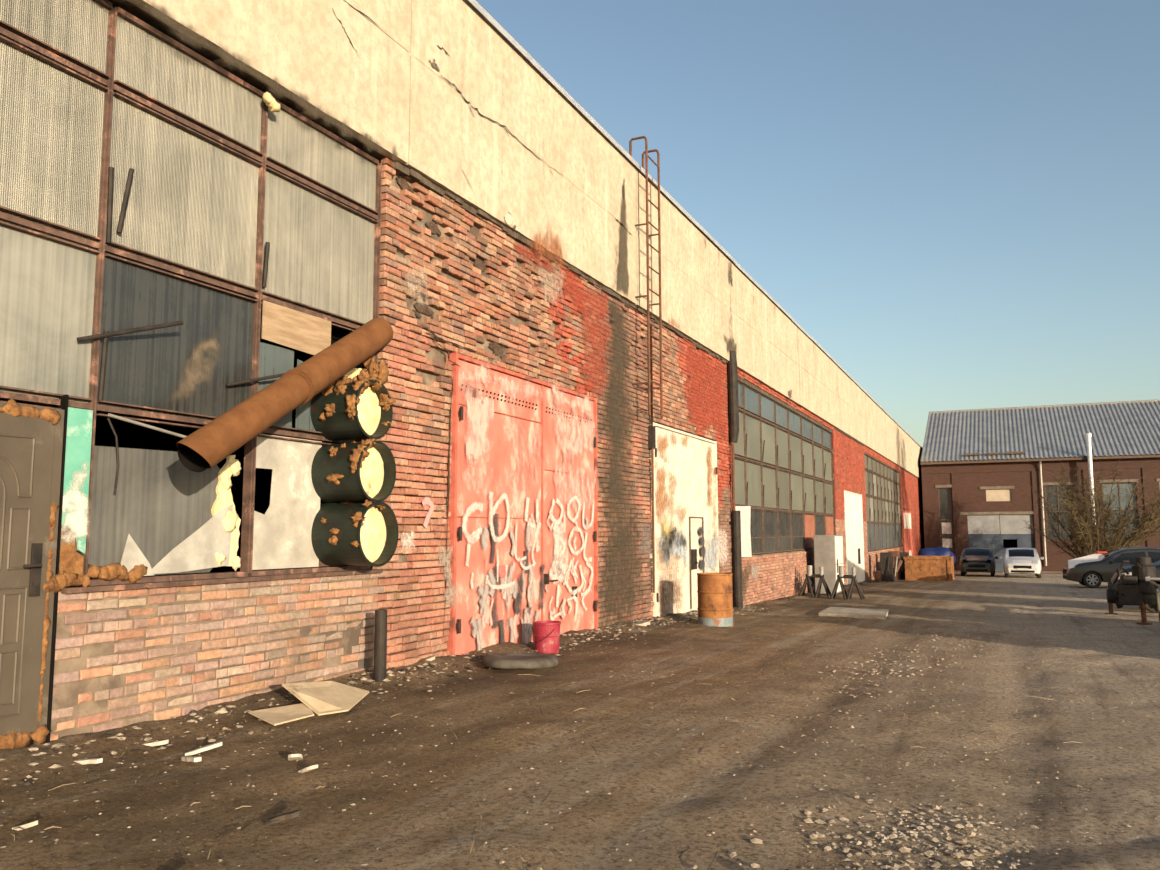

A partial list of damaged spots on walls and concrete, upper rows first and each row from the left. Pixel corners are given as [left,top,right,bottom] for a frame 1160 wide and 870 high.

crack [332,5,380,57]
crack [437,45,564,176]
spalling [425,218,441,236]
leakage [617,179,629,294]
spalling [412,297,434,318]
leakage [601,304,643,619]